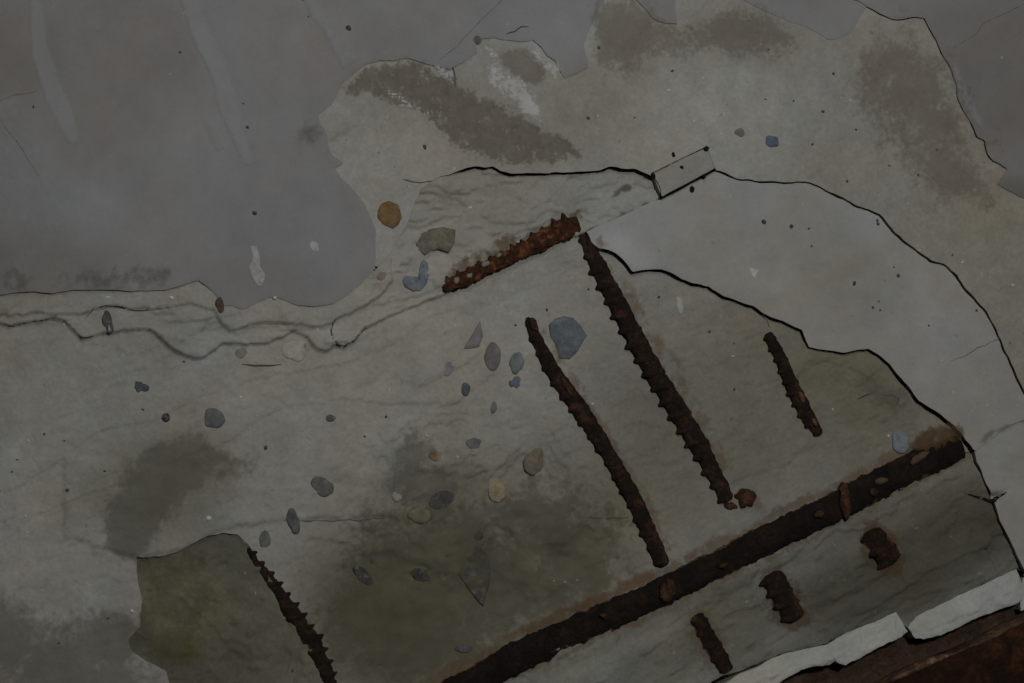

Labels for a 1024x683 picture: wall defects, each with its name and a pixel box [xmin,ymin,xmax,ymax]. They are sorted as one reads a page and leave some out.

leakage [347,46,579,164]
peeling [319,0,1024,394]
spalling [0,168,1024,683]
rust [874,614,1024,683]